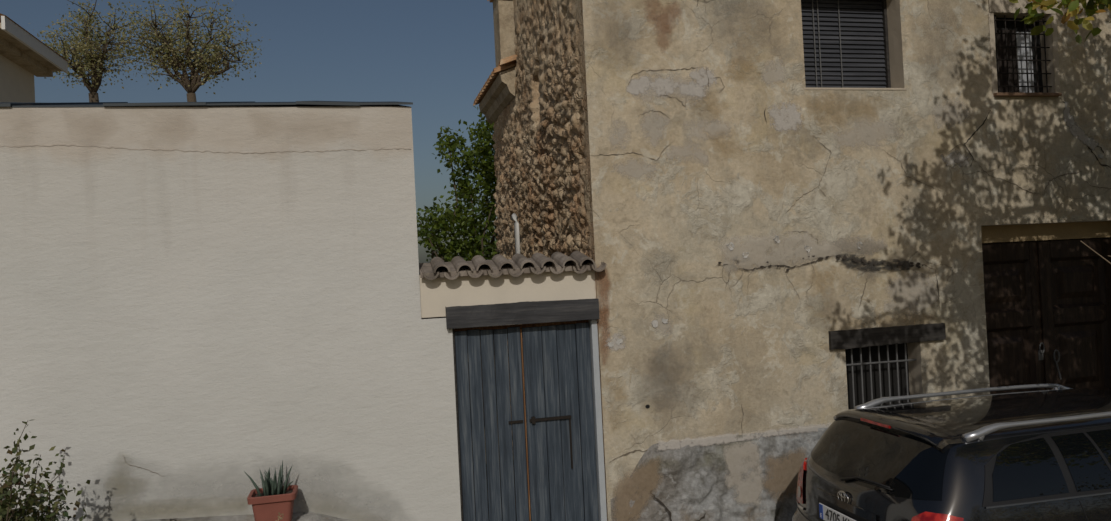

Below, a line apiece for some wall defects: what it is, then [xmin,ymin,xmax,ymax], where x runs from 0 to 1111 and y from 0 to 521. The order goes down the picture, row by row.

peeling [627,67,717,101]
crack [950,97,1111,195]
crack [715,137,837,283]
spalling [614,461,659,521]
spalling [725,442,762,503]